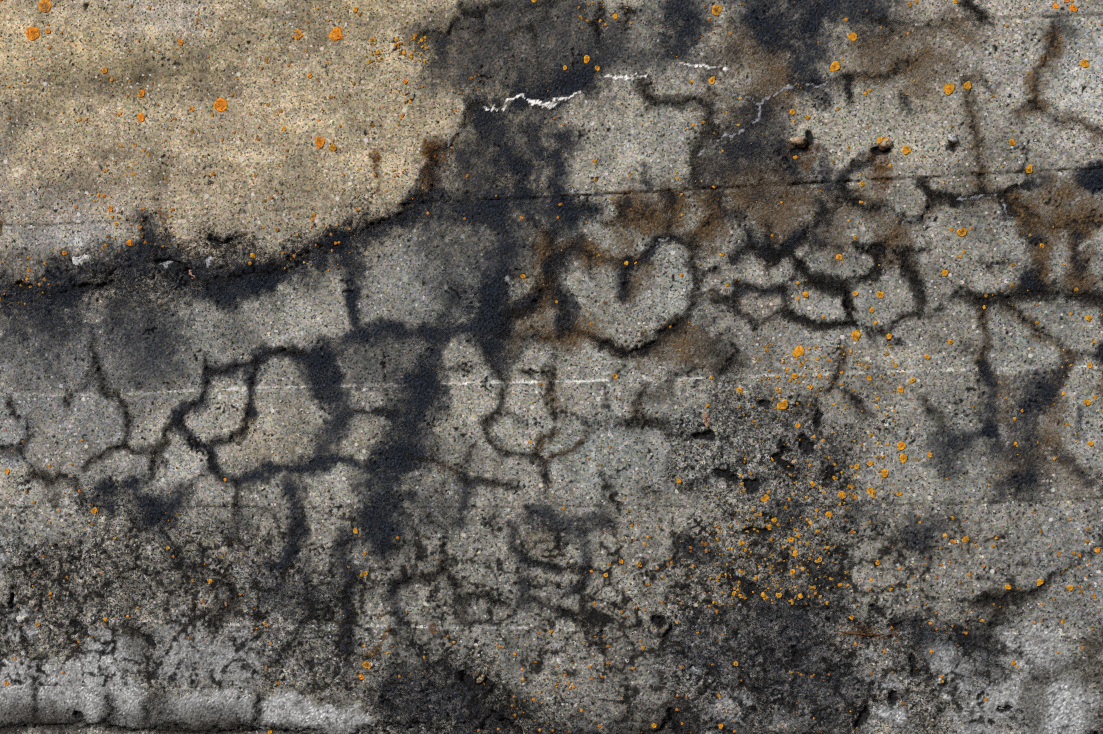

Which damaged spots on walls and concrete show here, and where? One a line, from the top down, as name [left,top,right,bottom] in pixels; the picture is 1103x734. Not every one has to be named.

crack [195,101,484,285]
leakage [0,0,717,570]
crack [414,74,1103,497]
leakage [699,0,896,261]
crack [792,1,990,92]
crack [1014,26,1103,141]
leakage [1018,161,1103,291]
leakage [934,361,1072,497]
crack [0,335,1103,734]
leakage [527,504,608,594]
leakage [879,703,907,732]
leakage [921,623,1103,734]